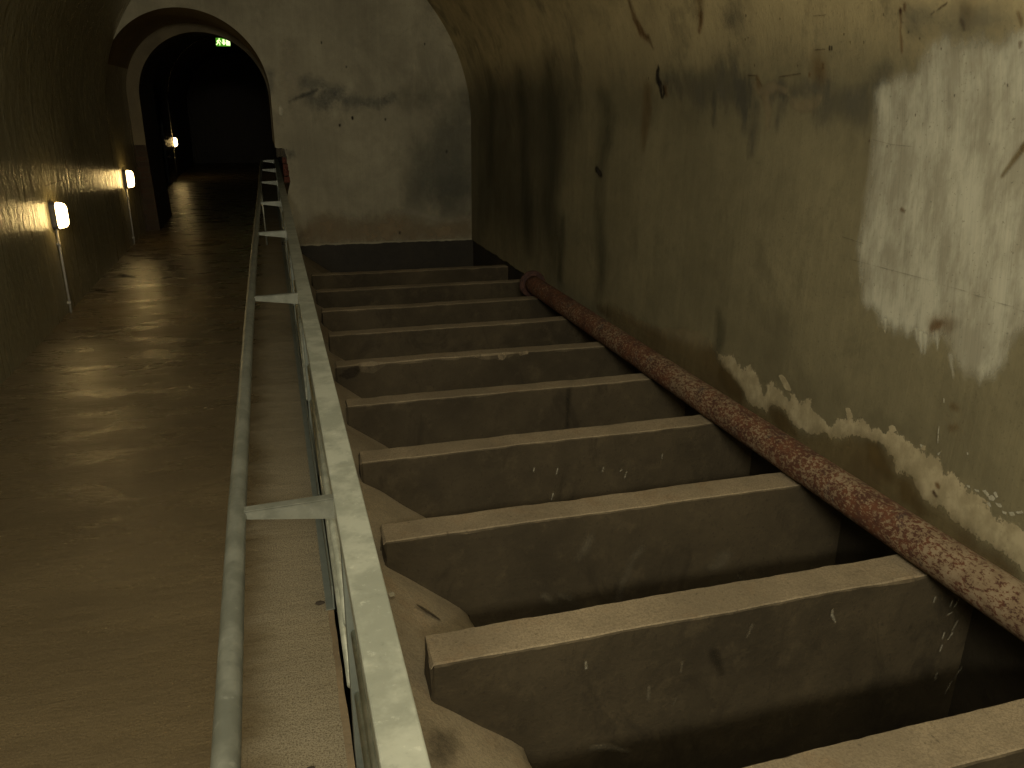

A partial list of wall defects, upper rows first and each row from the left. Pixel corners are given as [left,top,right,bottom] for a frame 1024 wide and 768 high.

spalling [473,241,524,280]
flaking render [654,329,1024,572]
spalling [948,608,1024,717]